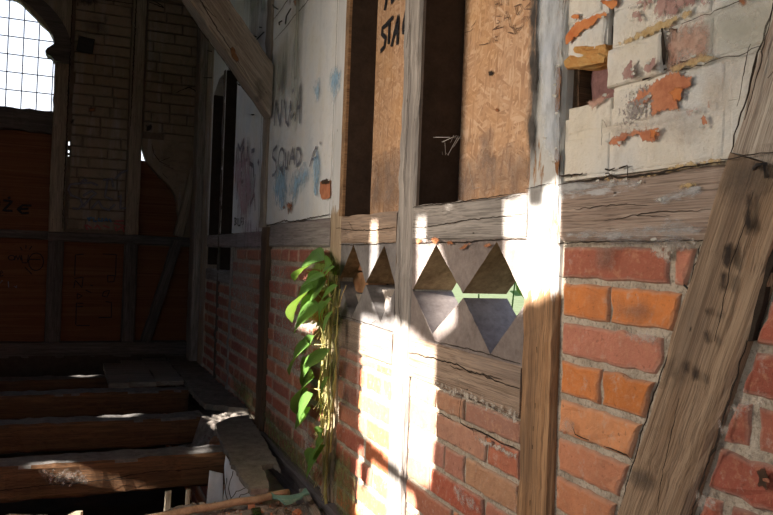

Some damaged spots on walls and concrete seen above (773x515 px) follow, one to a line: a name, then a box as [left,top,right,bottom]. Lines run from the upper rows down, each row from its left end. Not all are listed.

crack [403,1,773,284]
spalling [539,0,721,175]
crack [267,212,396,245]
crack [338,285,401,331]
crack [412,341,520,389]
crack [434,386,519,450]
crack [572,355,668,506]
crack [657,399,679,513]
crack [714,224,745,341]